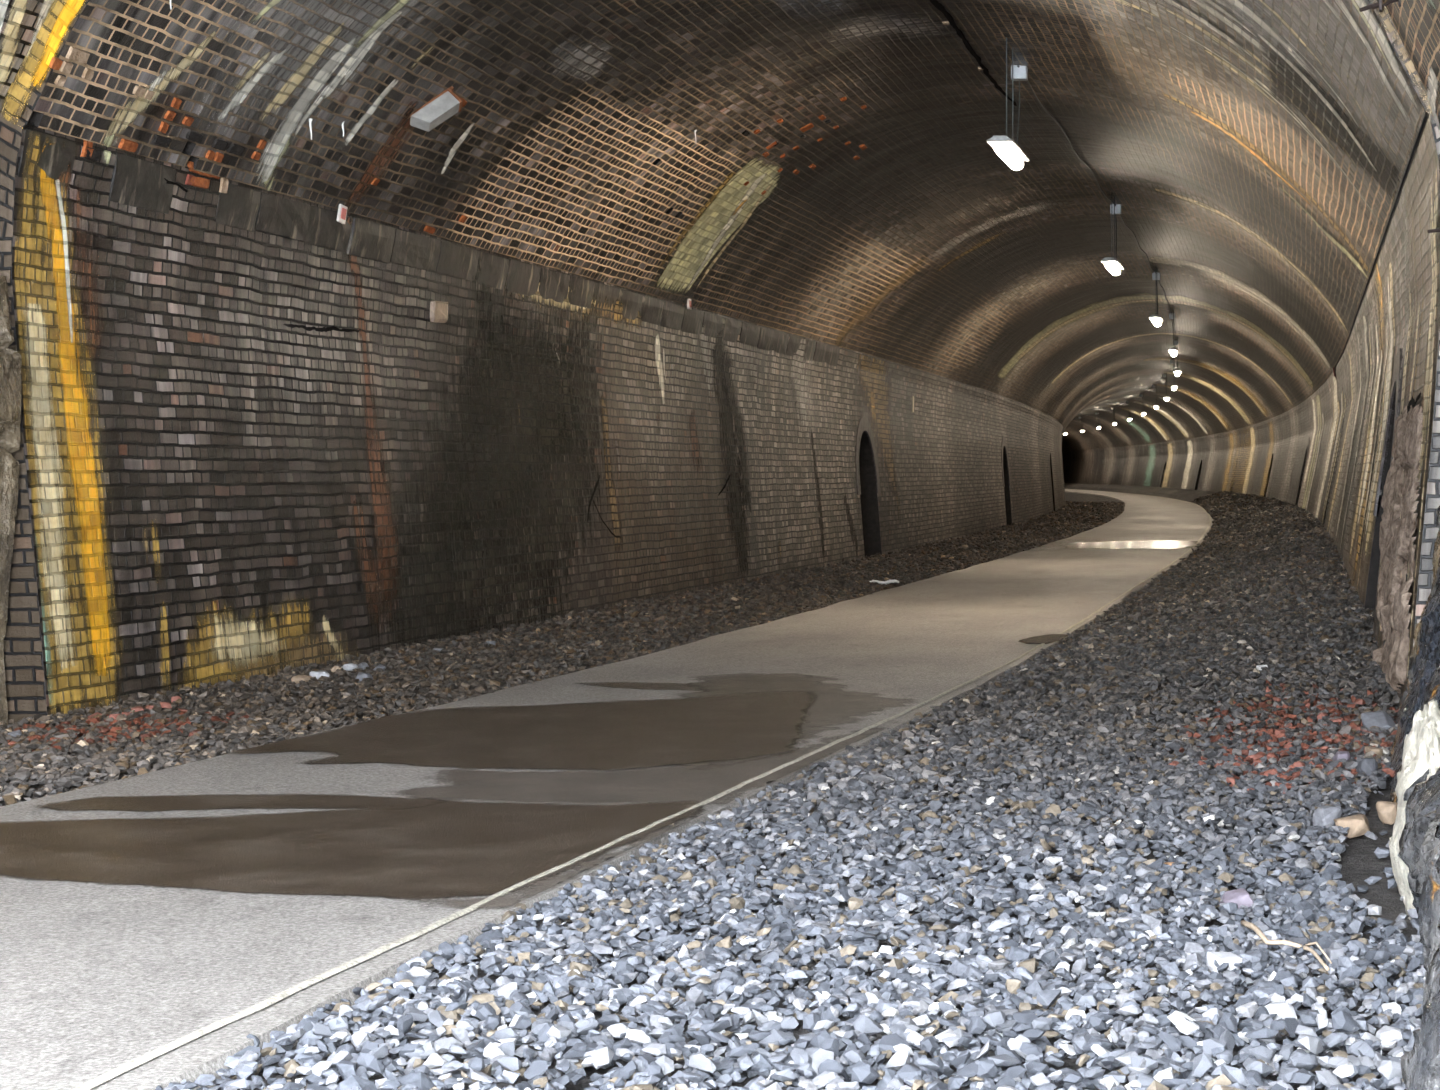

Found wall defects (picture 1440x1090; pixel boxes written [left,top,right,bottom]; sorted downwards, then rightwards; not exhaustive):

spalling [49,46,94,87]
crack [930,0,1017,106]
spalling [80,140,101,161]
spalling [118,97,267,193]
crack [283,324,359,332]
water stain [655,334,674,404]
water stain [375,266,642,650]